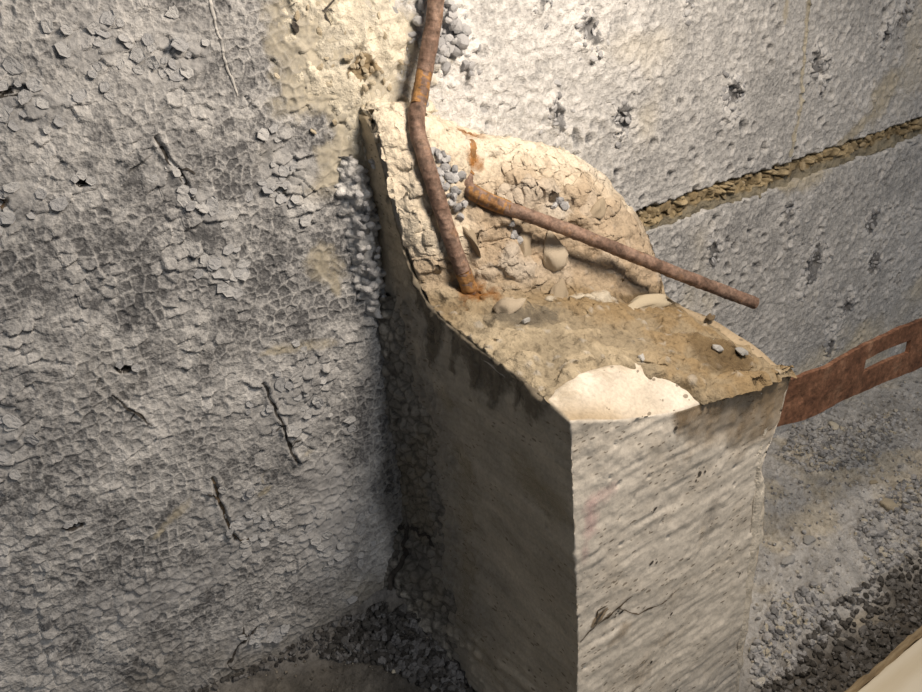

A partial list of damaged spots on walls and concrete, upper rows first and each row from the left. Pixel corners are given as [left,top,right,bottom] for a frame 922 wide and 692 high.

crack [154,138,196,201]
spalling [344,0,797,405]
crack [112,395,153,426]
crack [262,383,301,462]
peeling [271,370,333,437]
peeling [343,416,356,432]
crack [208,477,249,541]
crack [387,524,435,591]
crack [582,592,675,640]